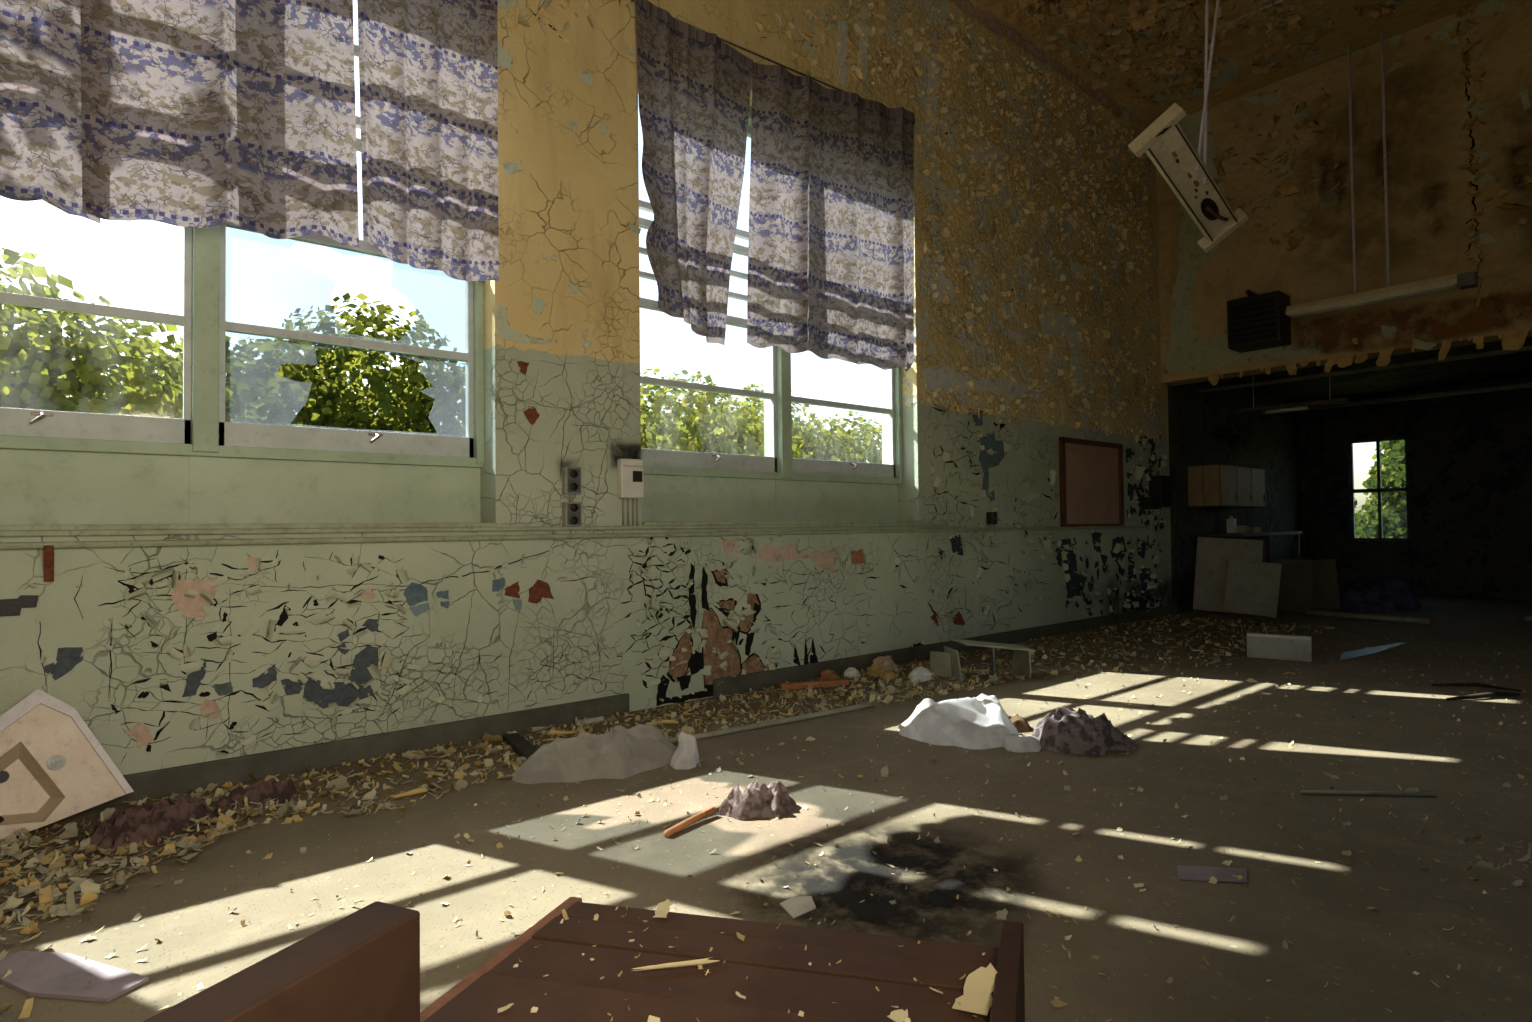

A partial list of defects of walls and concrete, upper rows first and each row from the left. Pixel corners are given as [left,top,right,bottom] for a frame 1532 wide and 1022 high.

peeling [498,0,636,43]
crack [1456,8,1490,307]
peeling [753,0,1529,618]
peeling [44,647,85,680]
peeling [252,554,450,722]
peeling [492,577,555,611]
crack [25,351,1058,763]
flaking render [637,530,866,706]
peeling [930,611,966,626]